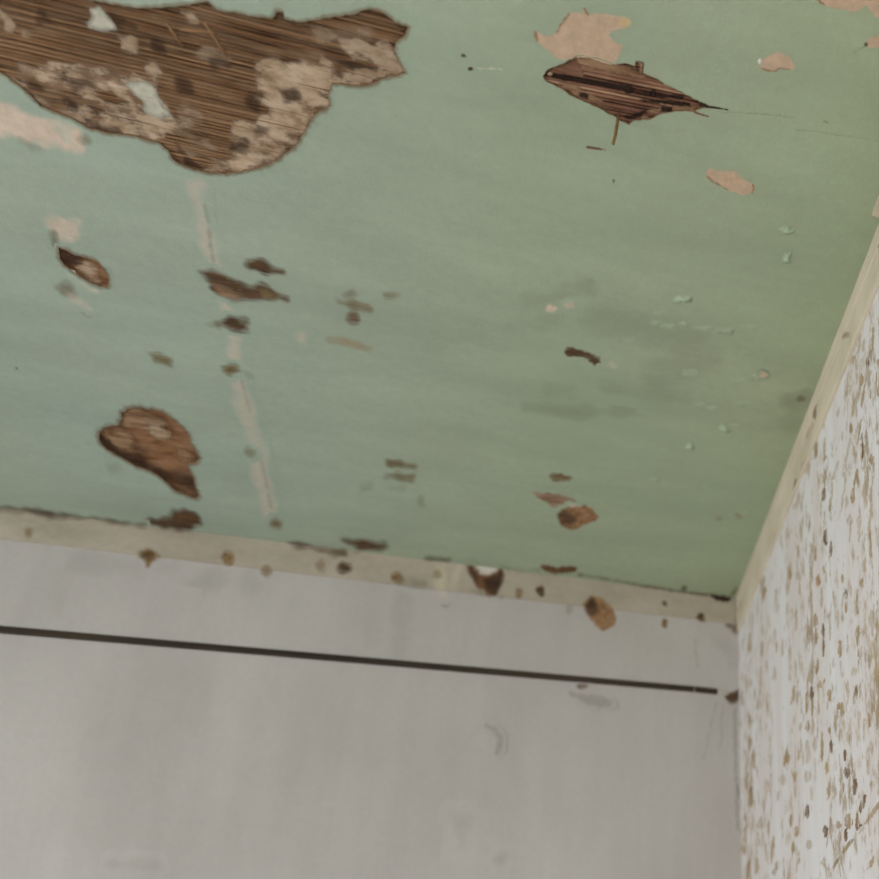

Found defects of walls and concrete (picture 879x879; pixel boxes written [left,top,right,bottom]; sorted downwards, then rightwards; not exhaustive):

flaking render [0,0,414,179]
flaking render [531,6,728,145]
peeling [758,49,796,73]
peeling [705,167,757,197]
flaking render [32,207,115,300]
spalling [190,252,296,340]
spalling [562,345,621,371]
flaking render [91,400,208,538]
spalling [531,471,601,532]
peeling [428,561,508,613]
flaking render [579,593,618,634]